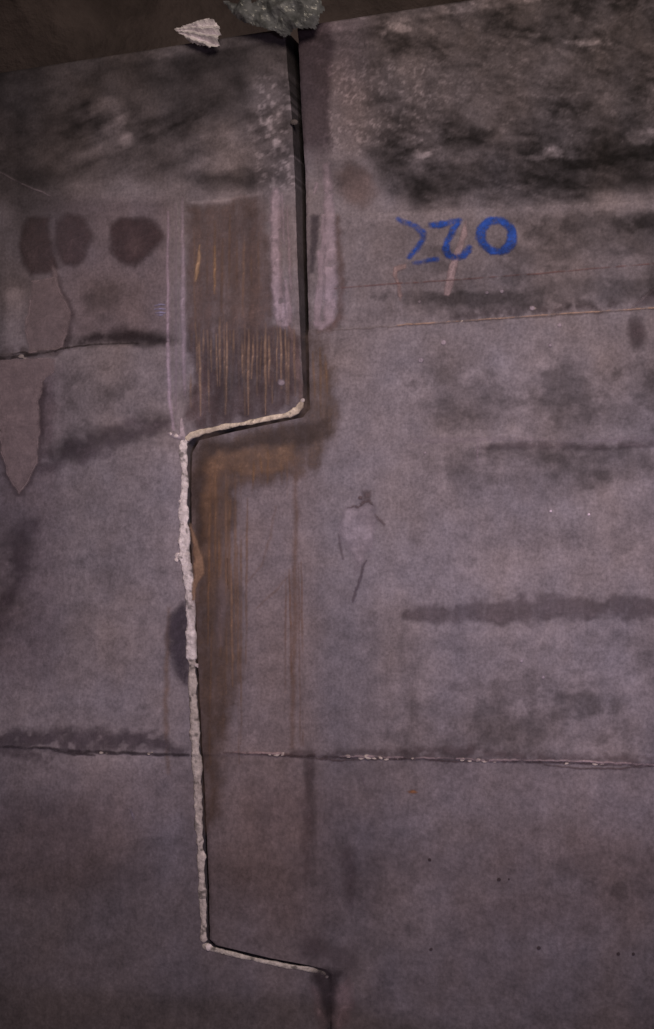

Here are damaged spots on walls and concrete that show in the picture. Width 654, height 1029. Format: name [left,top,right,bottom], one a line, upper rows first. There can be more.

leakage [20,215,91,273]
crack [0,331,167,360]
leakage [41,216,186,472]
corrosion [186,198,337,824]
leakage [403,595,654,625]
crack [0,729,189,757]
crack [225,747,654,770]